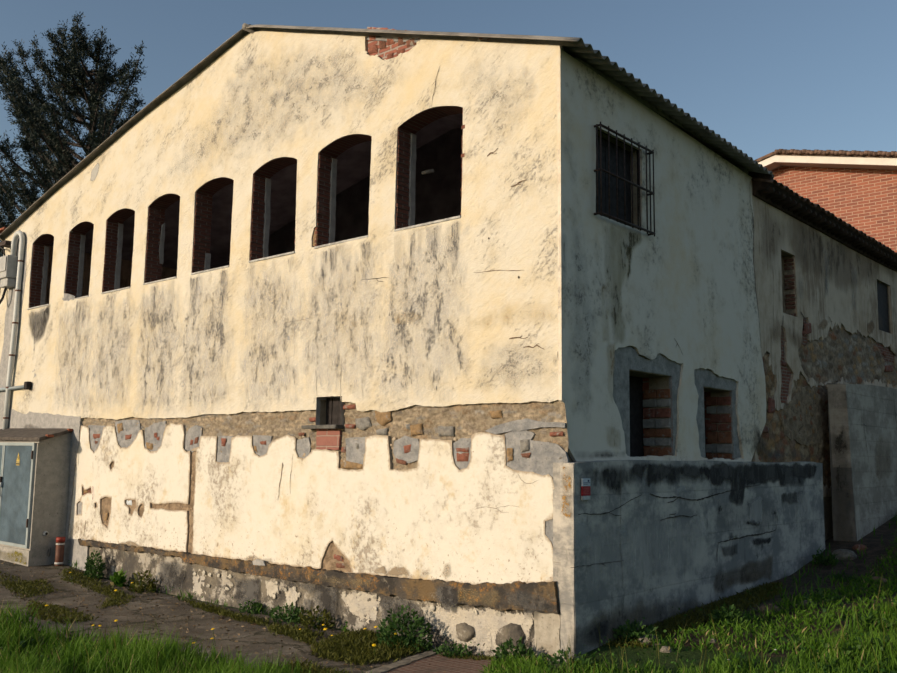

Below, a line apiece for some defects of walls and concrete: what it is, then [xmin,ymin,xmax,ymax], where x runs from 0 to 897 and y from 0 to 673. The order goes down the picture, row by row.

leakage [30,307,49,350]
leakage [57,271,226,405]
leakage [305,243,372,382]
leakage [379,223,463,390]
flaking render [757,318,897,488]
flaking render [88,420,167,457]
crack [578,472,813,521]
leakage [596,433,816,525]
flaking render [321,541,351,573]
crack [717,517,778,552]
peeling [340,590,381,624]
peeling [418,603,534,651]